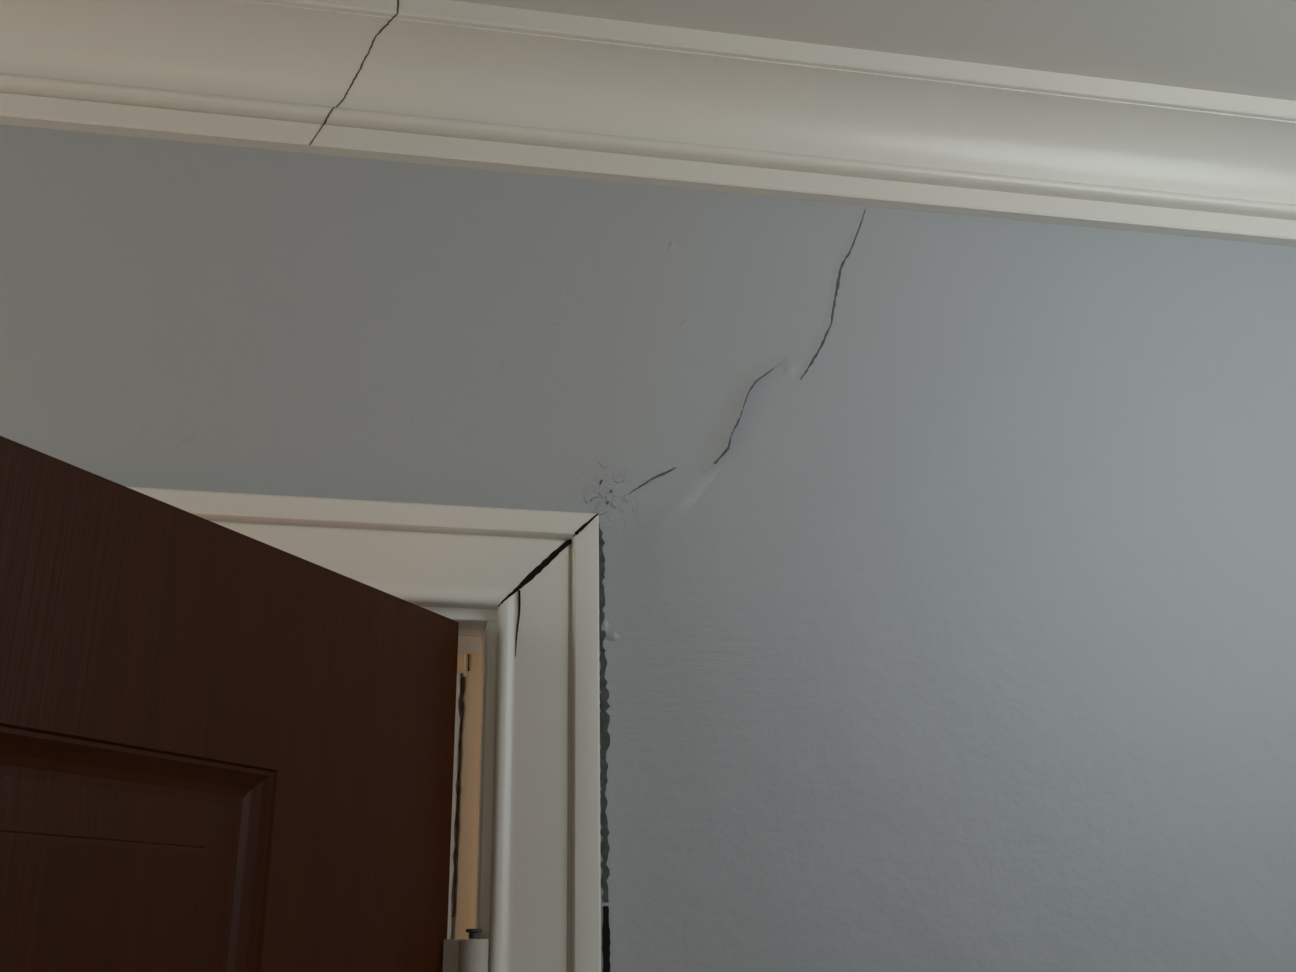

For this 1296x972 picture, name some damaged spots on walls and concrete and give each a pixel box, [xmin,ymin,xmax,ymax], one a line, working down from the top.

crack [309,0,399,145]
crack [798,209,866,380]